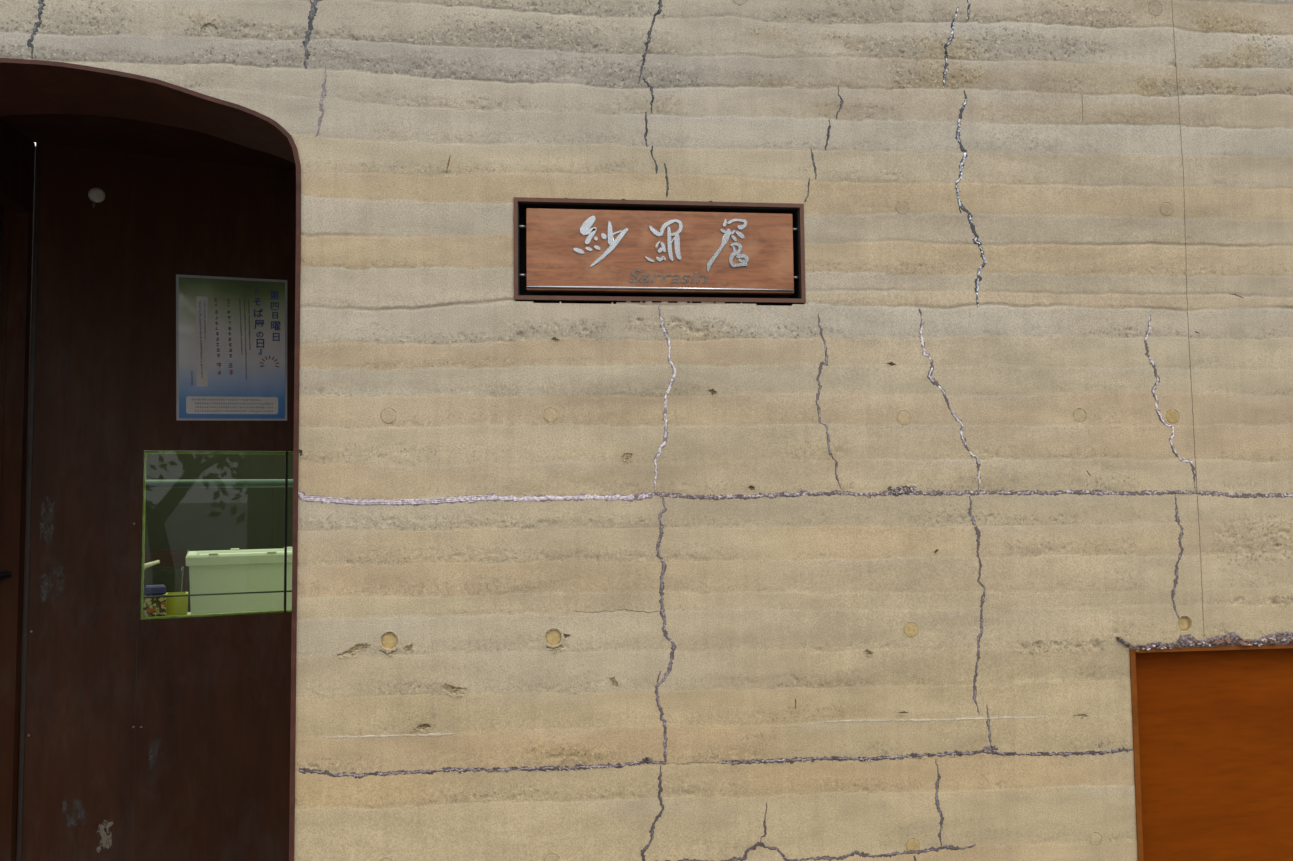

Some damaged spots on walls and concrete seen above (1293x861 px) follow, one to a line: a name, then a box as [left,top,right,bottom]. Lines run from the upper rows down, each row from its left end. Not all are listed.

crack [27,0,46,59]
crack [302,0,327,137]
crack [638,0,669,197]
crack [804,86,844,202]
crack [943,0,987,307]
crack [298,304,1293,861]